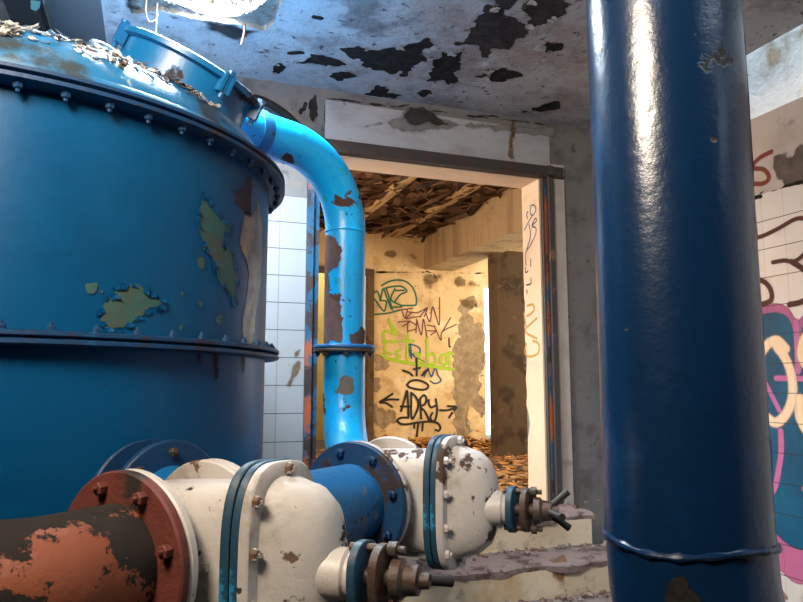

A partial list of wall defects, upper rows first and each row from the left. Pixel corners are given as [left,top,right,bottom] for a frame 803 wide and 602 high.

spalling [272,0,571,100]
peeling [299,95,325,123]
spalling [522,101,561,114]
flaking render [452,296,488,438]